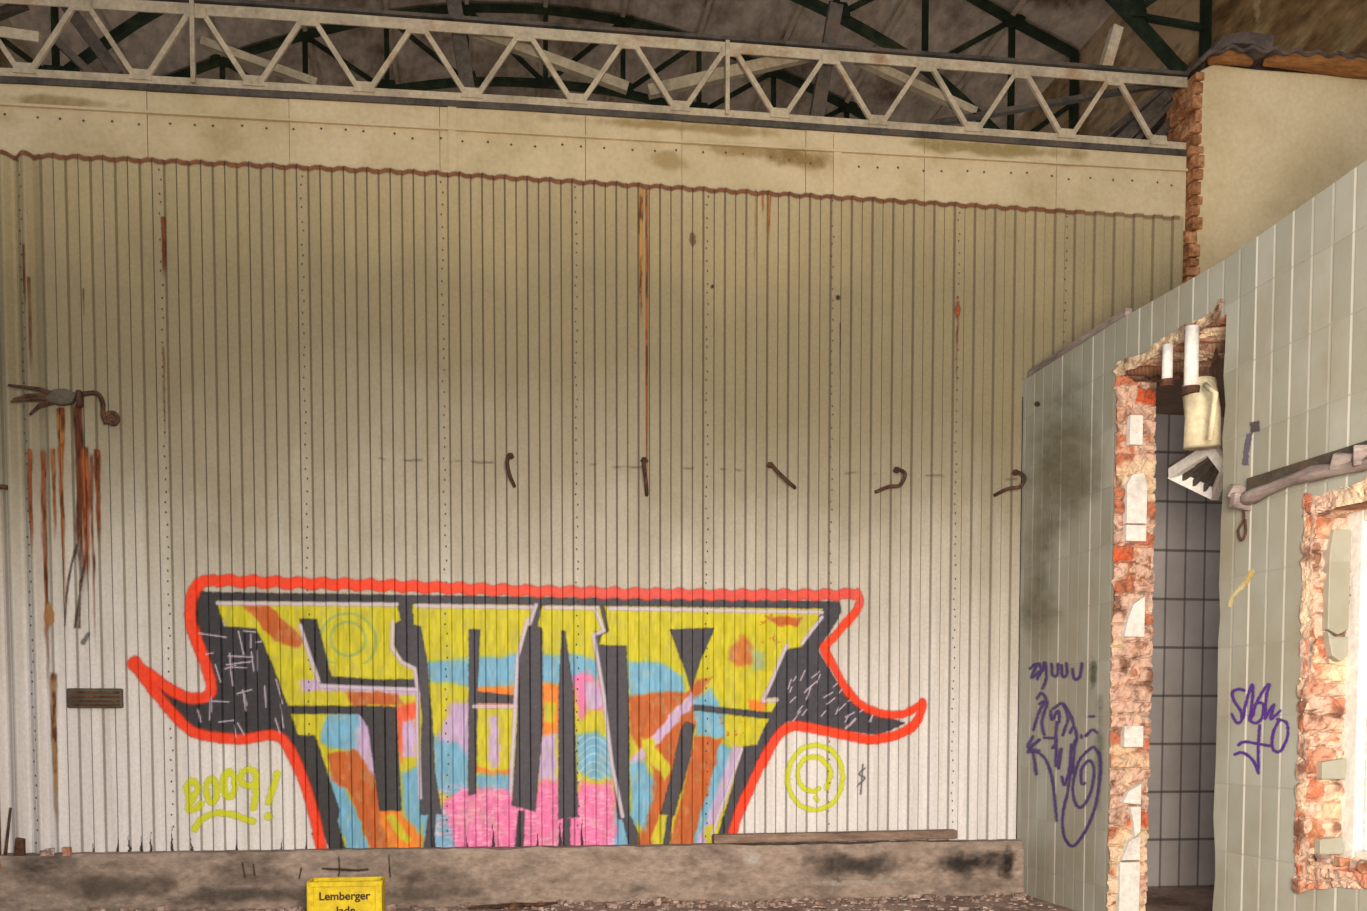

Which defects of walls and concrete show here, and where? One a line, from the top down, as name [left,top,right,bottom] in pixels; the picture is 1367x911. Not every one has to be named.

corrosion [0,150,1090,449]
corrosion [50,674,58,801]
corrosion [27,405,100,646]
spalling [1106,298,1226,911]
spalling [1292,477,1367,894]
leakage [823,855,893,885]
leakage [945,853,1014,877]